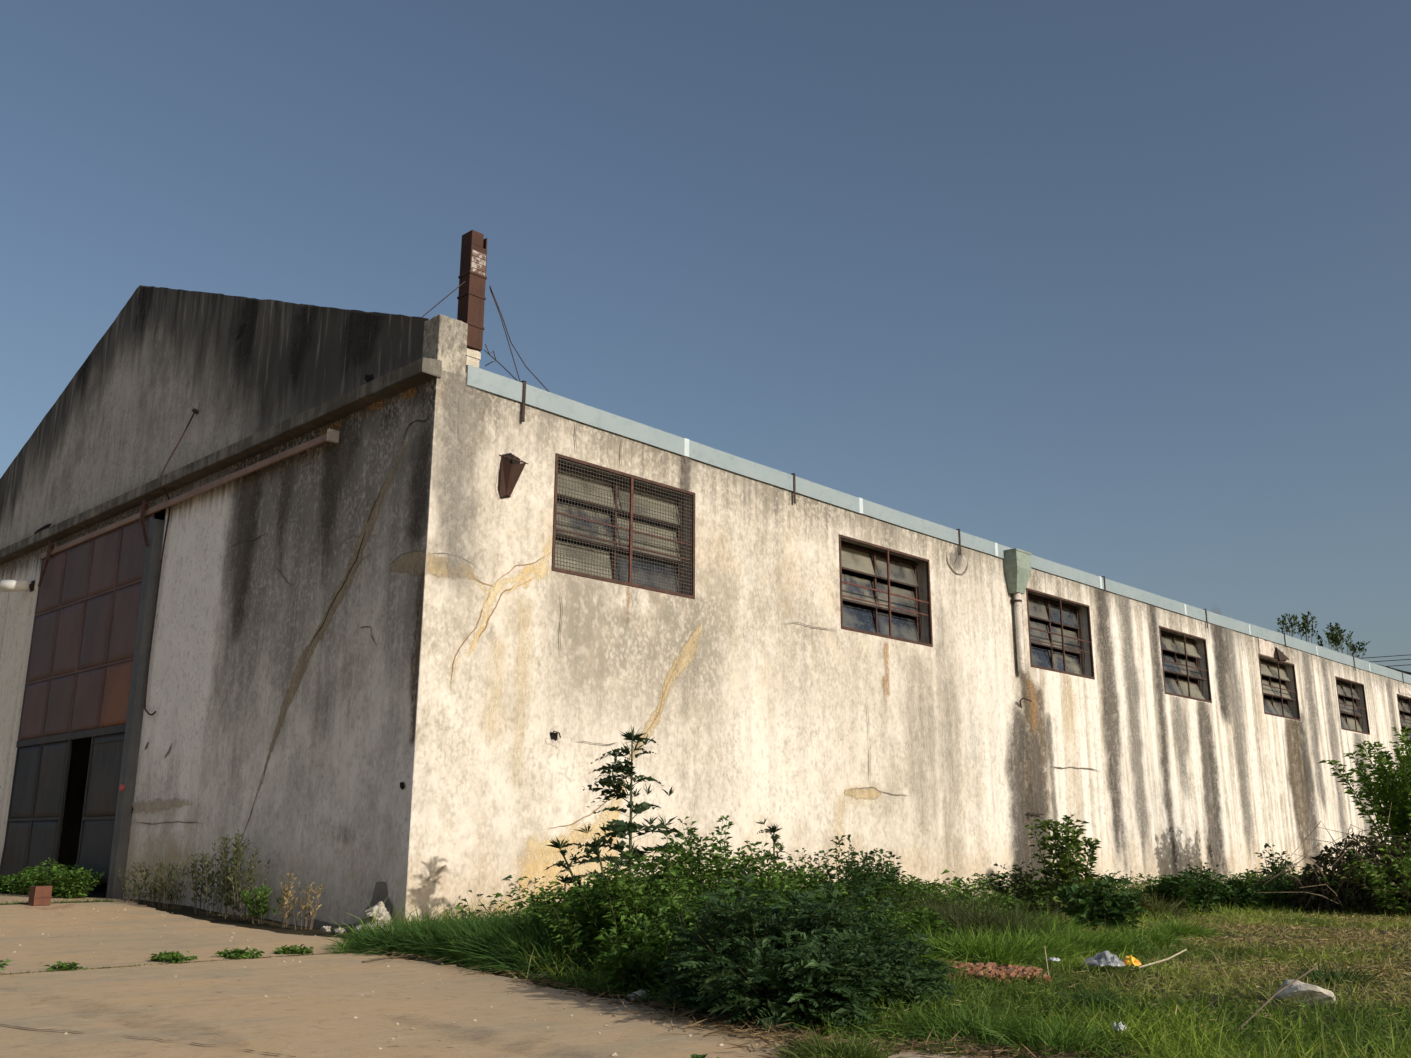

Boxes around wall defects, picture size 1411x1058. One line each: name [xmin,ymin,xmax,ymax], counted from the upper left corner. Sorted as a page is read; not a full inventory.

leakage [238,299,258,371]
leakage [345,312,377,365]
leakage [233,471,261,633]
leakage [321,433,358,556]
crack [239,416,563,844]
leakage [410,573,424,742]
crack [526,625,702,855]
leakage [1007,673,1061,886]
leakage [1096,588,1147,861]
leakage [1150,604,1254,881]
leakage [1286,652,1374,874]
leakage [1387,681,1402,778]